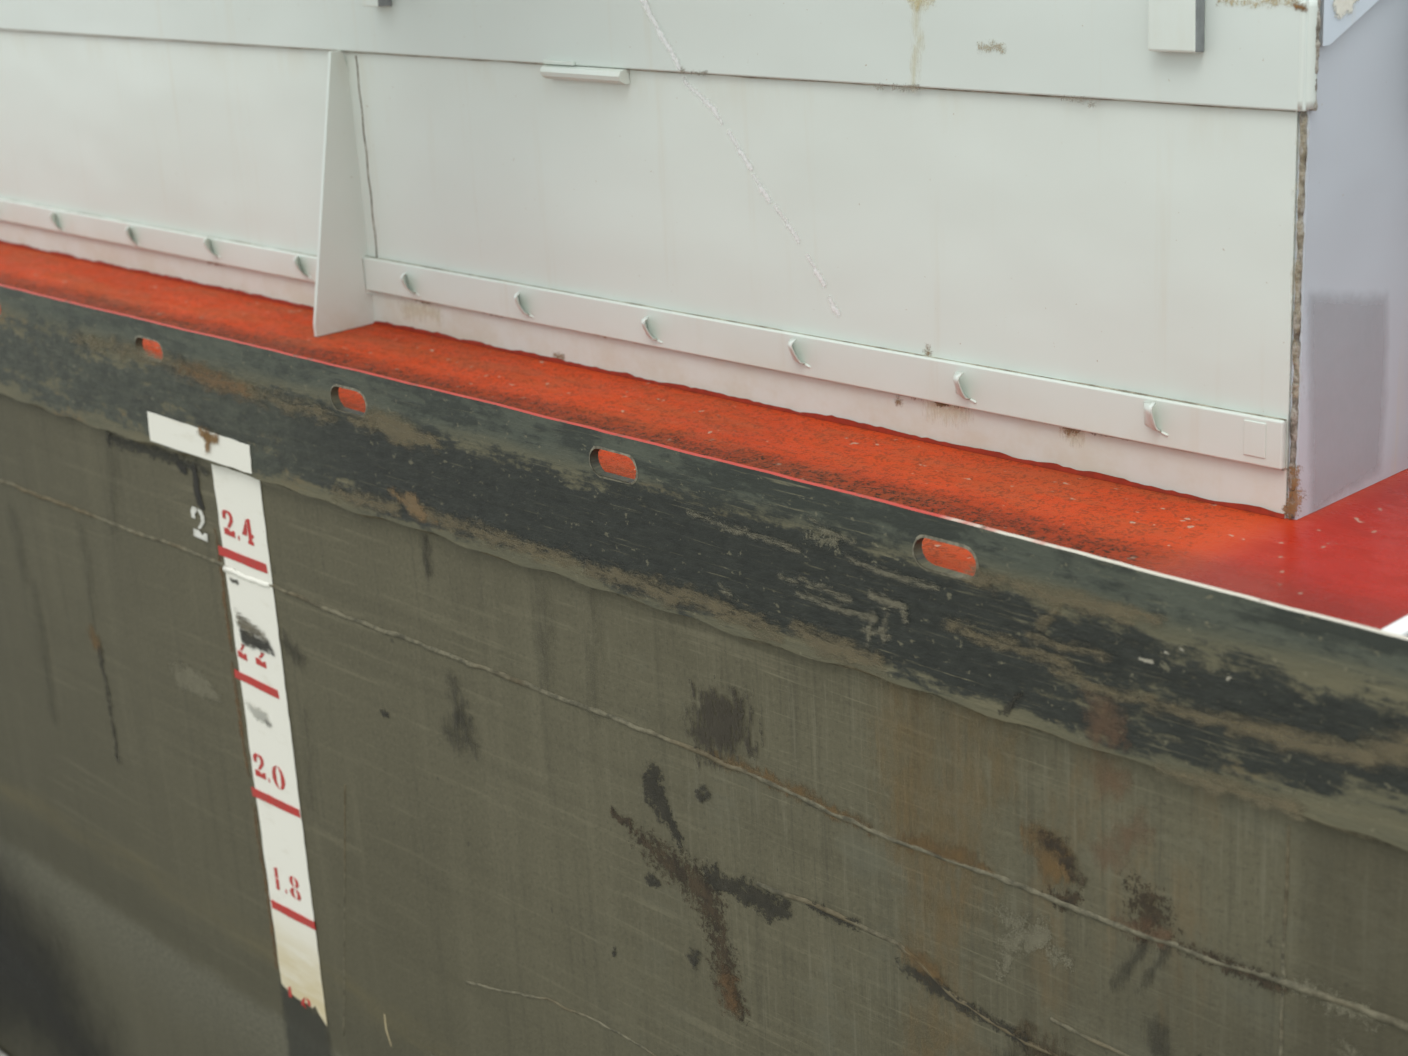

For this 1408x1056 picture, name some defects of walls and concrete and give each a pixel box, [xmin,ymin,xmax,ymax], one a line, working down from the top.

peeling [348,411,442,448]
corrosion [1282,465,1306,518]
peeling [331,486,885,671]
corrosion [610,763,859,1022]
corrosion [1020,824,1086,915]
corrosion [1121,872,1289,994]
corrosion [895,948,1066,1056]